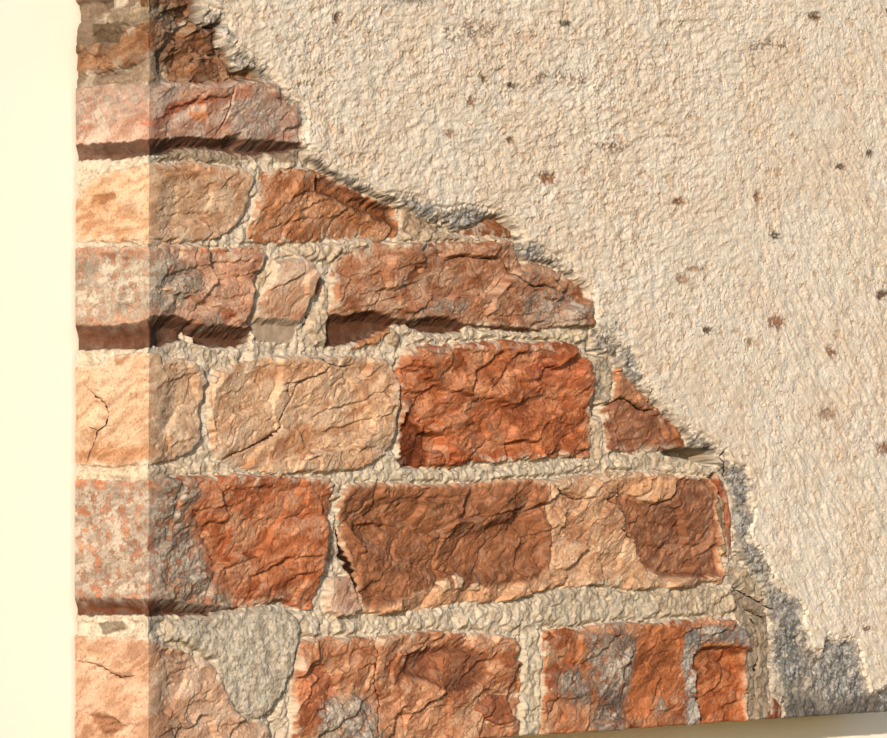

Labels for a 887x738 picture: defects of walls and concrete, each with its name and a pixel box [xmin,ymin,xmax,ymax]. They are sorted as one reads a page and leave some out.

crack [85,385,109,463]
crack [223,356,350,460]
spalling [193,0,887,725]
crack [731,587,773,698]